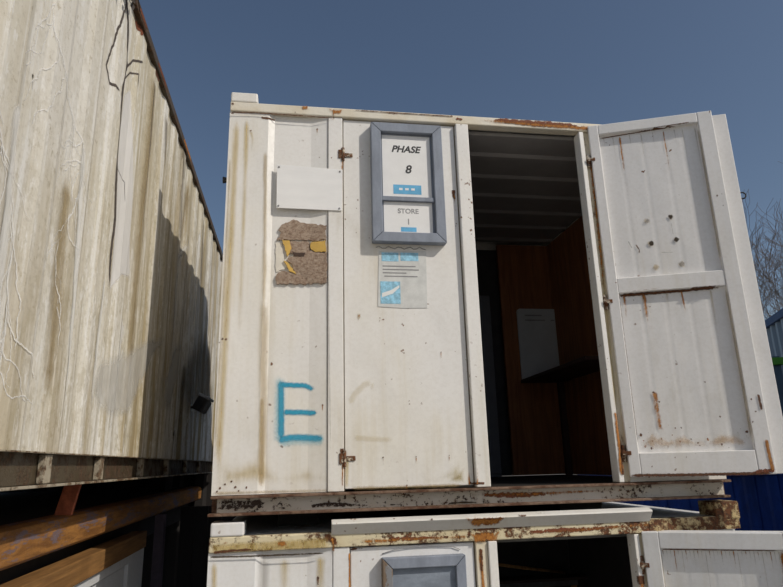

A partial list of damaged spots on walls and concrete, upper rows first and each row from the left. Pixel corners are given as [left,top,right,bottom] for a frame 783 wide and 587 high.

leakage [26,4,91,389]
leakage [139,89,155,244]
rust [590,155,604,276]
leakage [0,106,34,403]
peeling [275,219,328,285]
rust [620,285,718,442]
rust [614,413,774,477]
rust [469,476,588,498]
rust [348,517,504,587]
rust [529,524,647,534]
rust [663,549,783,568]